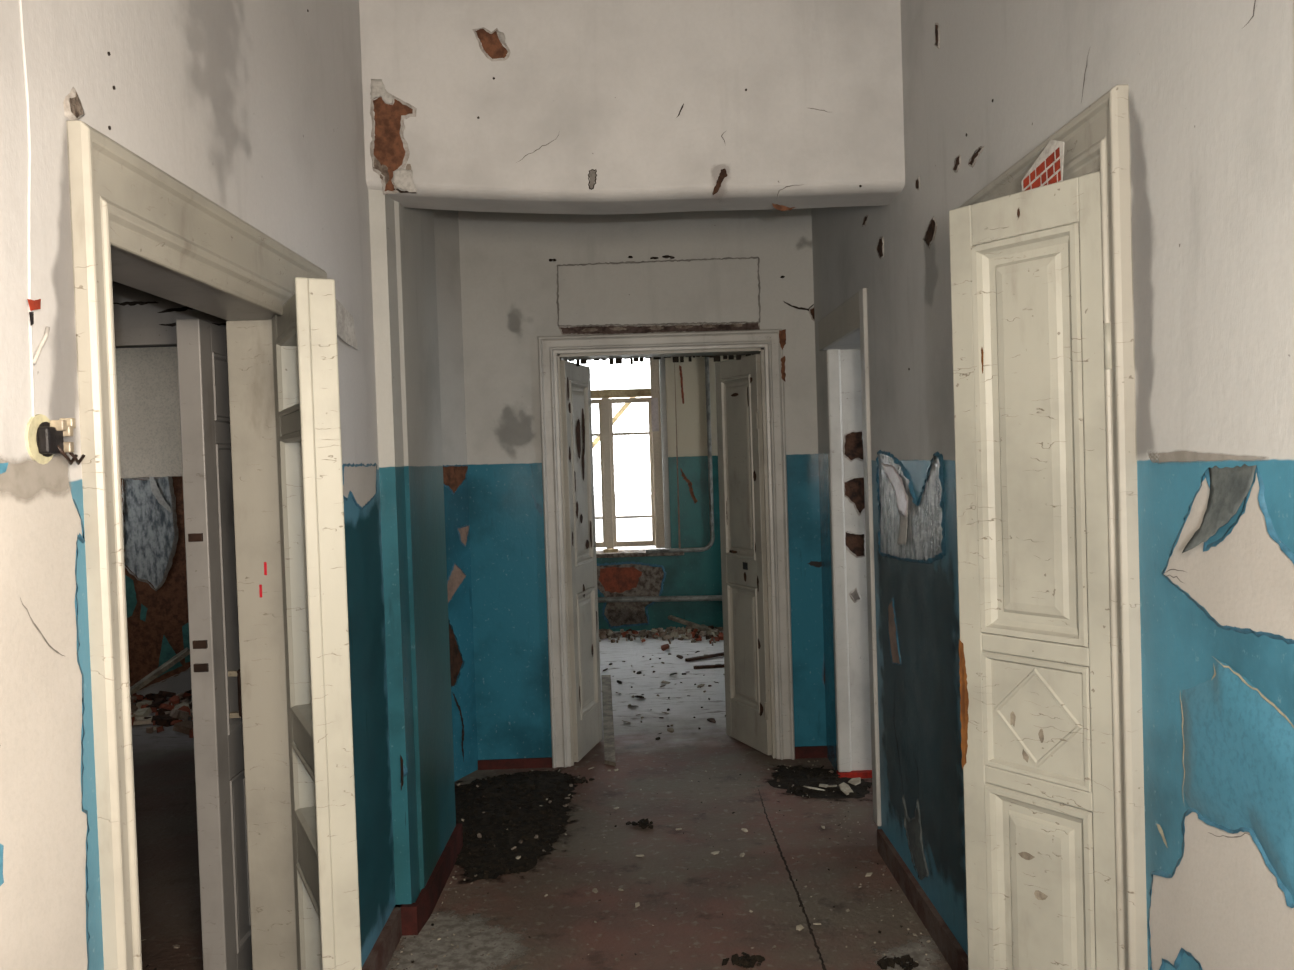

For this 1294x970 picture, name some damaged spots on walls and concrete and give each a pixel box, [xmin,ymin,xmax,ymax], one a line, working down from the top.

flaking render [472,27,511,61]
flaking render [370,79,417,195]
flaking render [121,476,191,693]
peeling [342,463,377,510]
peeling [443,464,468,495]
flaking render [447,562,466,688]
peeling [457,524,470,547]
flaking render [583,561,667,628]
peeling [843,430,946,564]
peeling [1162,464,1294,644]
peeling [0,486,90,970]
peeling [1148,808,1294,970]